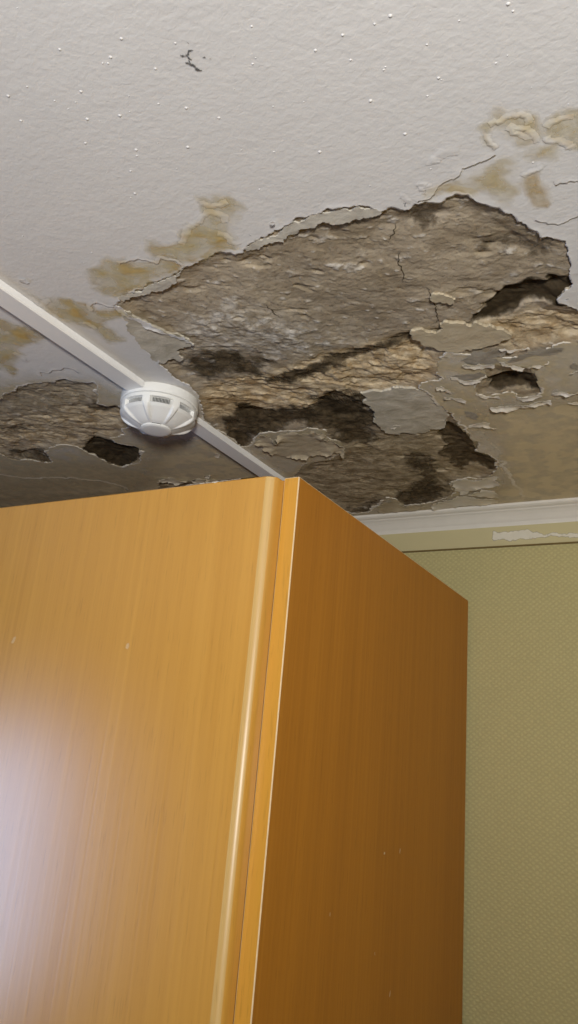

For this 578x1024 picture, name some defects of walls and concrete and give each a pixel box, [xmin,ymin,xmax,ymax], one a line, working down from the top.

crack [410,111,578,203]
leakage [152,222,228,270]
leakage [95,263,152,292]
leakage [58,299,122,340]
leakage [0,320,35,374]
flaking render [109,185,578,515]
flaking render [0,376,151,469]
leakage [234,428,342,478]